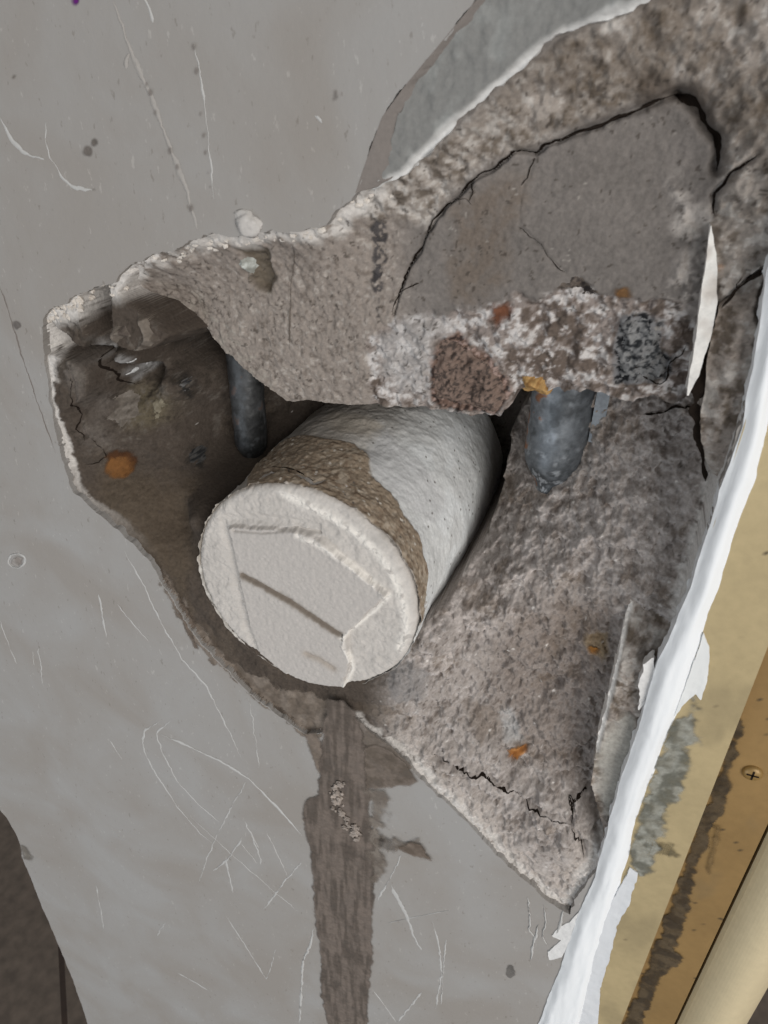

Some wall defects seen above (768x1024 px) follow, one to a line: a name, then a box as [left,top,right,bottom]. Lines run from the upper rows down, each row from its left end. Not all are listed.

peeling [356,0,650,192]
crack [392,94,759,311]
crack [90,344,139,384]
crack [70,378,107,465]
rust [105,451,137,478]
spalling [47,223,764,909]
water stain [159,572,431,1024]
crack [434,754,587,855]
rust [508,744,527,759]